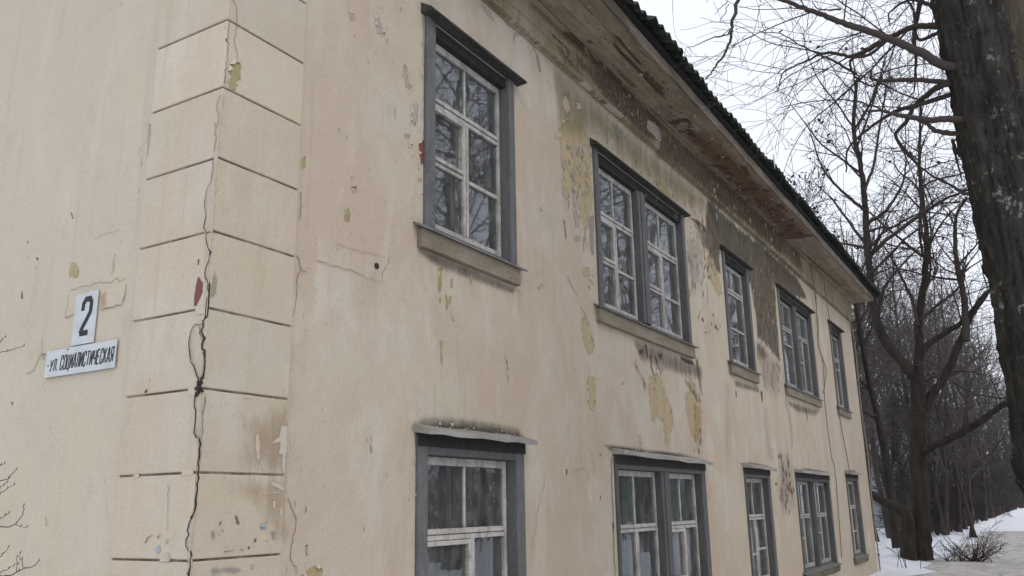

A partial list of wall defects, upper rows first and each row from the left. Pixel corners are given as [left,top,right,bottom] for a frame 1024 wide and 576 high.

peeling [225,59,241,91]
damp [564,91,692,202]
flaking render [533,35,806,360]
crack [185,0,238,576]
crack [294,242,386,311]
peeling [648,373,673,444]
peeling [684,376,702,454]